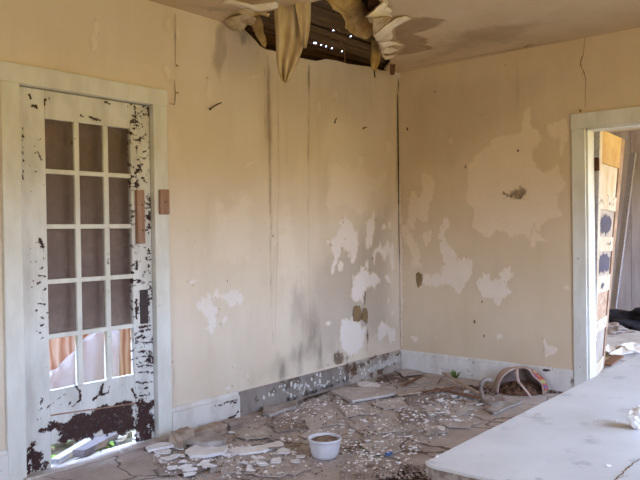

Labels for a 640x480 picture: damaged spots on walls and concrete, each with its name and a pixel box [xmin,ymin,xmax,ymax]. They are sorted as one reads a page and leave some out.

peeling [221,0,278,17]
peeling [366,0,411,60]
peeling [464,104,570,247]
peeling [405,172,515,307]
peeling [195,286,247,336]
peeling [322,209,397,357]
peeling [263,367,346,399]
peeling [357,353,401,376]